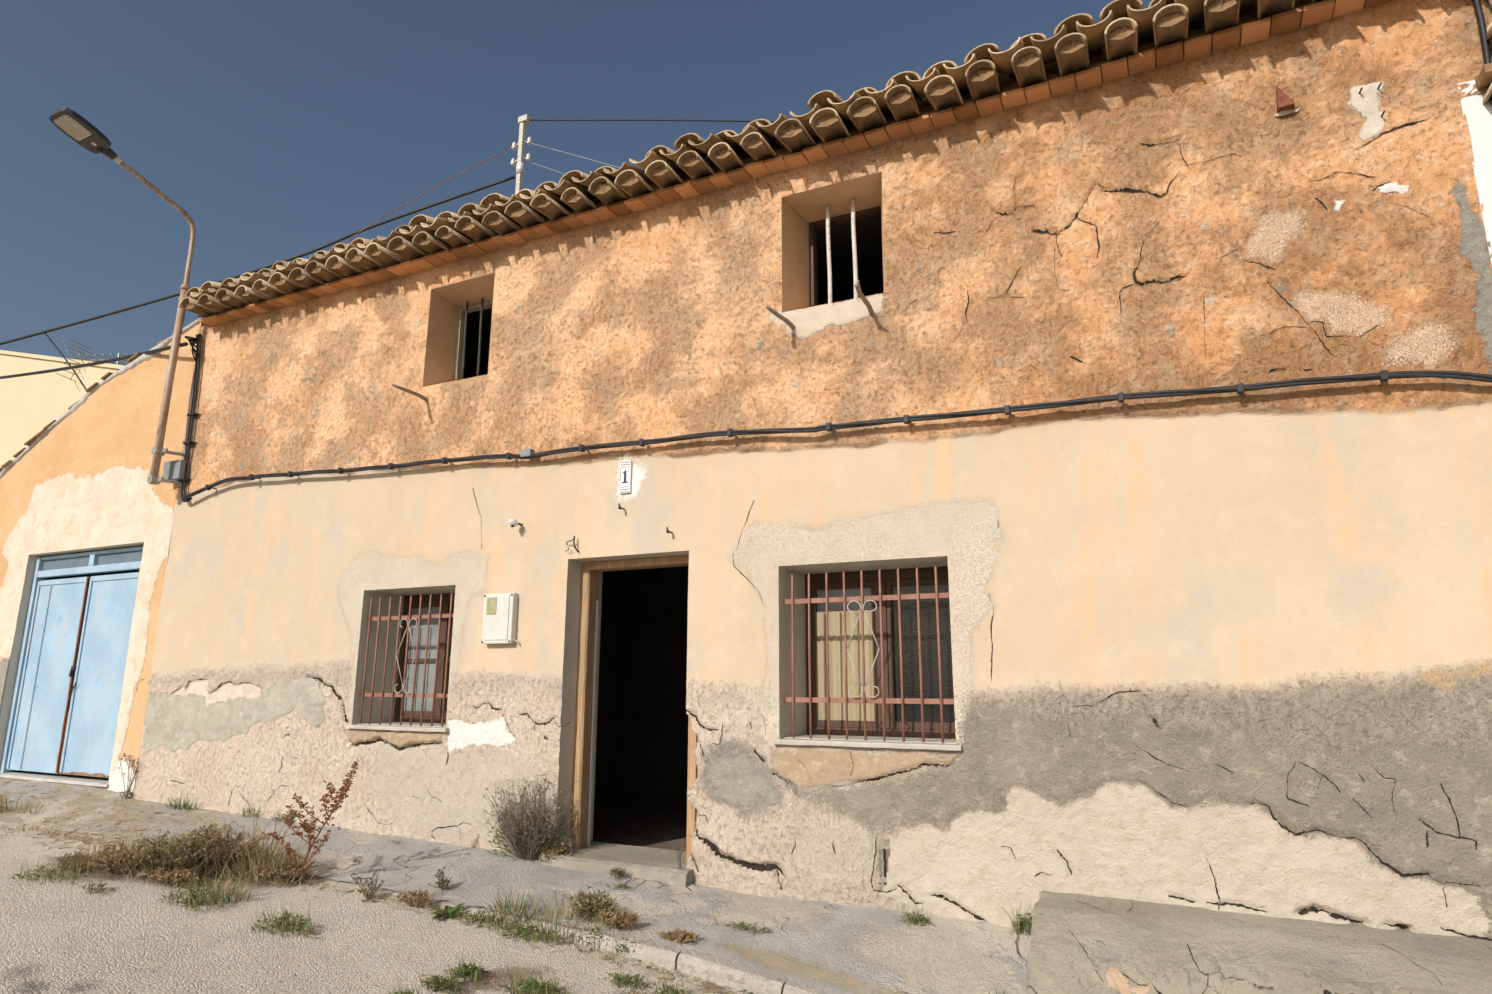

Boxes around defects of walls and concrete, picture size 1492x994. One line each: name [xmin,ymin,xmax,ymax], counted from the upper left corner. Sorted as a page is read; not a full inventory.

crack [1313,118,1430,217]
crack [933,139,1378,373]
peeling [0,464,174,783]
peeling [173,678,262,708]
peeling [345,729,556,844]
spalling [770,746,957,788]
crack [1067,690,1234,807]
crack [1001,846,1162,994]
peeling [787,780,1492,937]
crack [1187,944,1274,994]
crack [1168,762,1492,986]